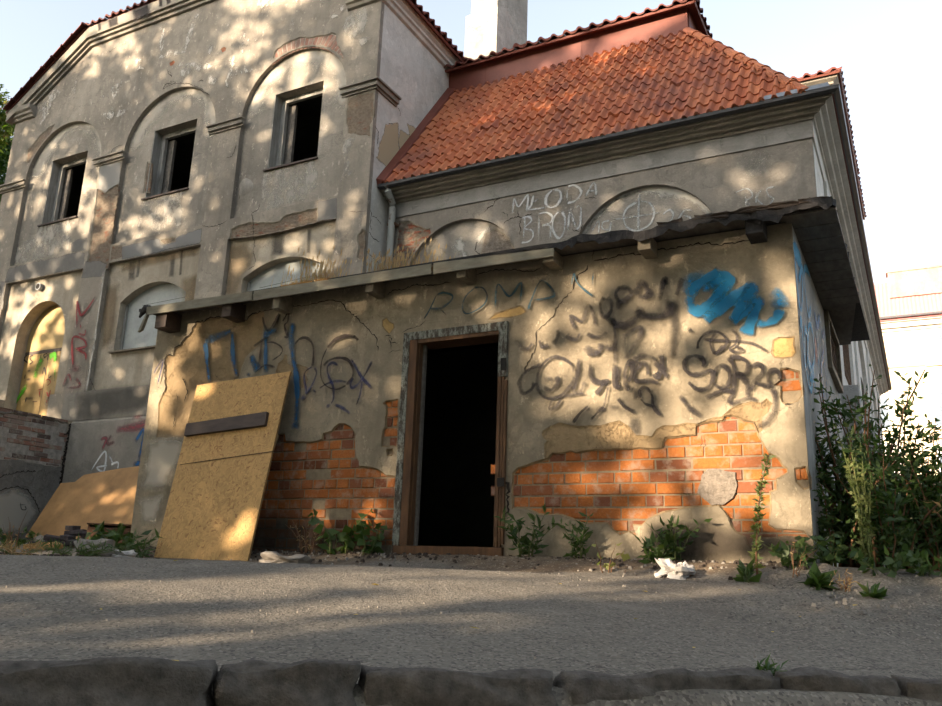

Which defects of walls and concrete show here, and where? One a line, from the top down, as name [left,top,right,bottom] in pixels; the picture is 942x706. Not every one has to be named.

flaking render [394,221,446,267]
crack [247,300,424,352]
crack [524,240,749,371]
crack [164,316,221,430]
flaking render [0,407,69,467]
crack [59,423,71,484]
flaking render [381,399,398,456]
flaking render [511,336,812,537]
crack [0,470,40,514]
flaking render [259,423,395,546]